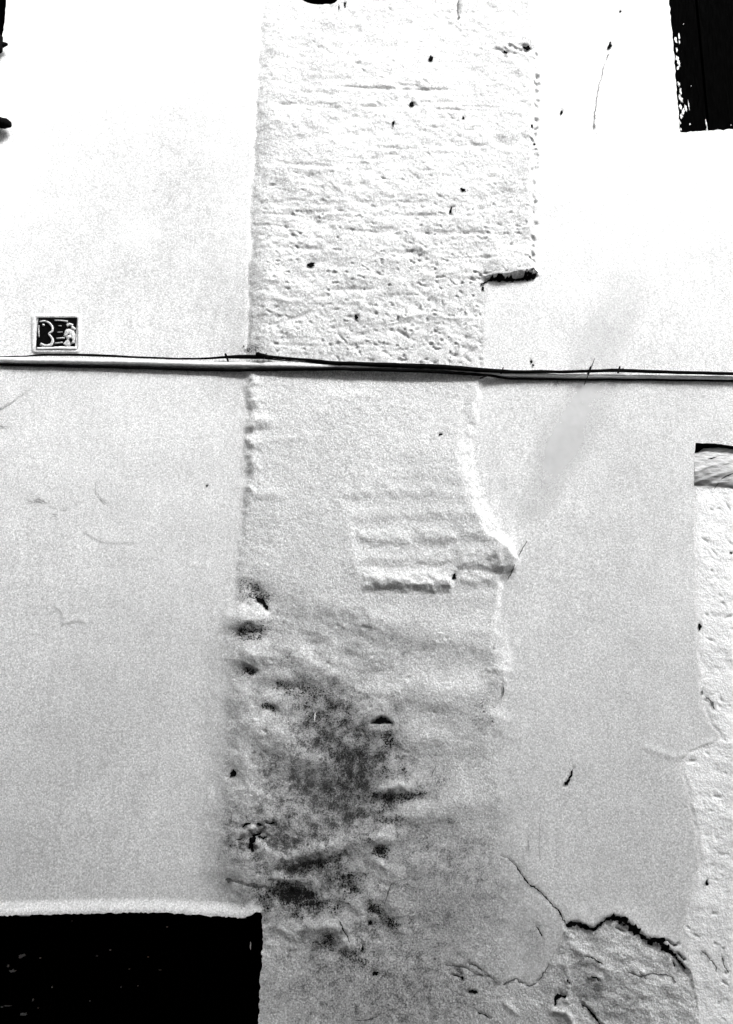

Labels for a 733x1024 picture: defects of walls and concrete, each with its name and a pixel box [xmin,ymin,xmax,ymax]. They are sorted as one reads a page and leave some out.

damp [228,617,277,647]
damp [238,577,274,605]
flaking render [336,478,506,595]
damp [264,653,427,828]
damp [236,810,401,939]
damp [313,929,374,969]
flaking render [434,920,699,1024]
crack [500,823,729,983]